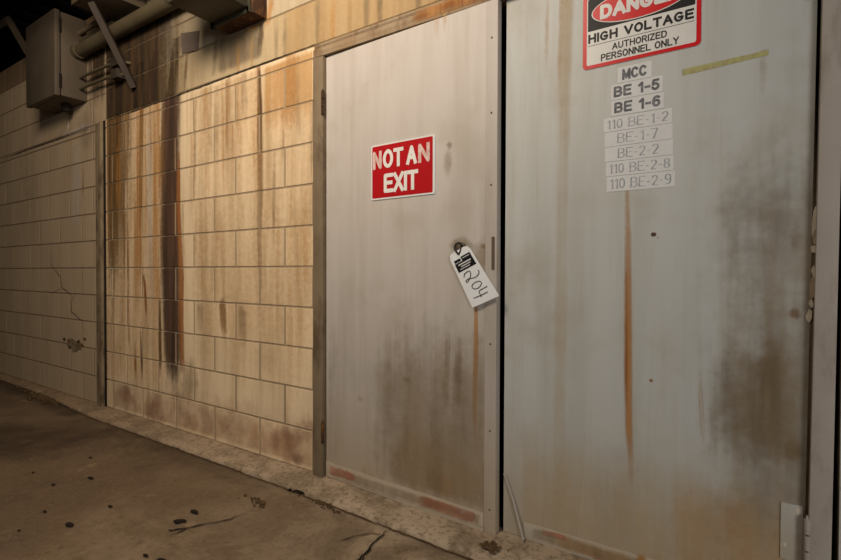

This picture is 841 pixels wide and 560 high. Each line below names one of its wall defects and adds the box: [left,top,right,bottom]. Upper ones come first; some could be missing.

corrosion [107,114,129,264]
corrosion [135,106,143,262]
corrosion [154,95,184,378]
spalling [63,337,86,352]
crack [0,380,474,560]